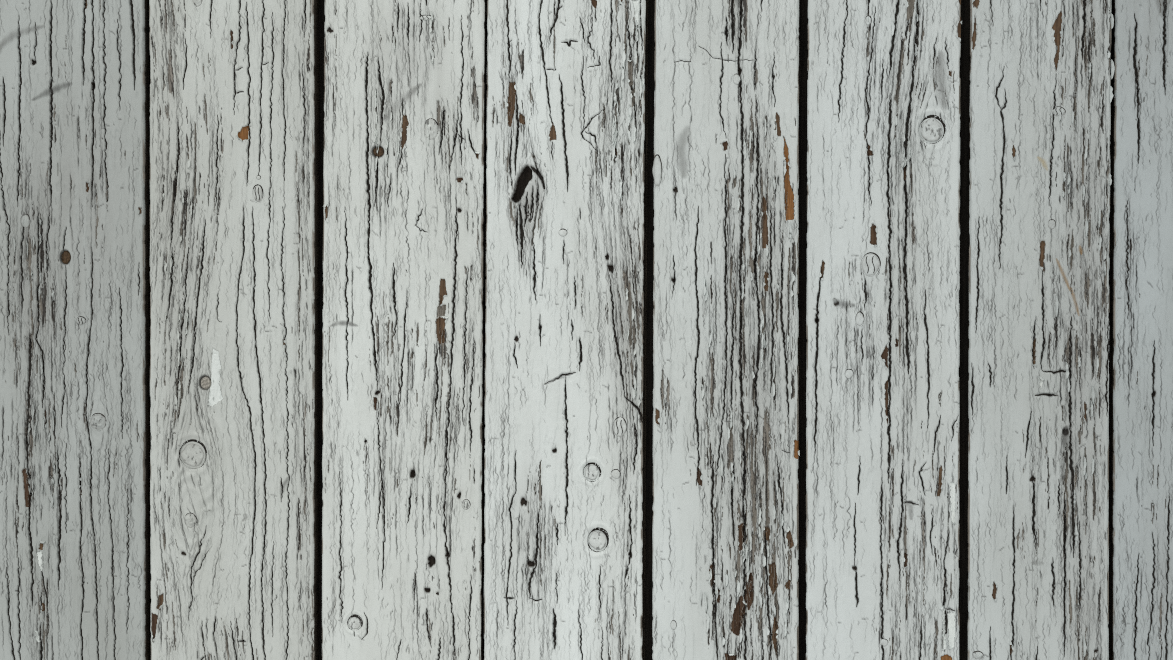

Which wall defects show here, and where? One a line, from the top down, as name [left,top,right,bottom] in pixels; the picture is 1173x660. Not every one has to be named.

peeling [236,126,249,141]
peeling [506,82,525,126]
crack [506,0,541,368]
crack [539,0,643,192]
peeling [436,279,449,344]
crack [506,244,643,660]
peeling [697,112,800,660]
peeling [940,605,955,660]